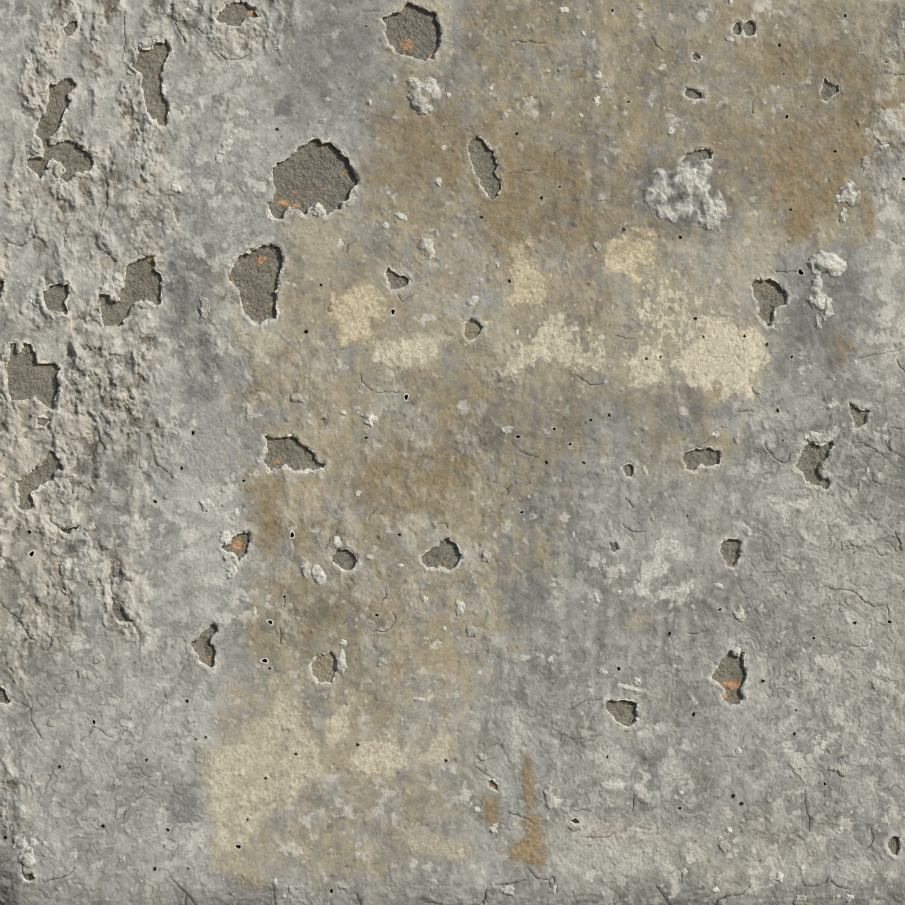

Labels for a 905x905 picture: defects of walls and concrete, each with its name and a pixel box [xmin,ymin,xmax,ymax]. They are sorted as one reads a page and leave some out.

spalling [373,0,451,70]
spalling [127,39,171,130]
spalling [267,137,359,223]
spalling [465,136,503,200]
spalling [226,245,285,362]
peeling [604,226,788,401]
spalling [263,434,325,474]
spalling [794,439,835,496]
spalling [420,538,463,573]
spalling [709,650,749,707]